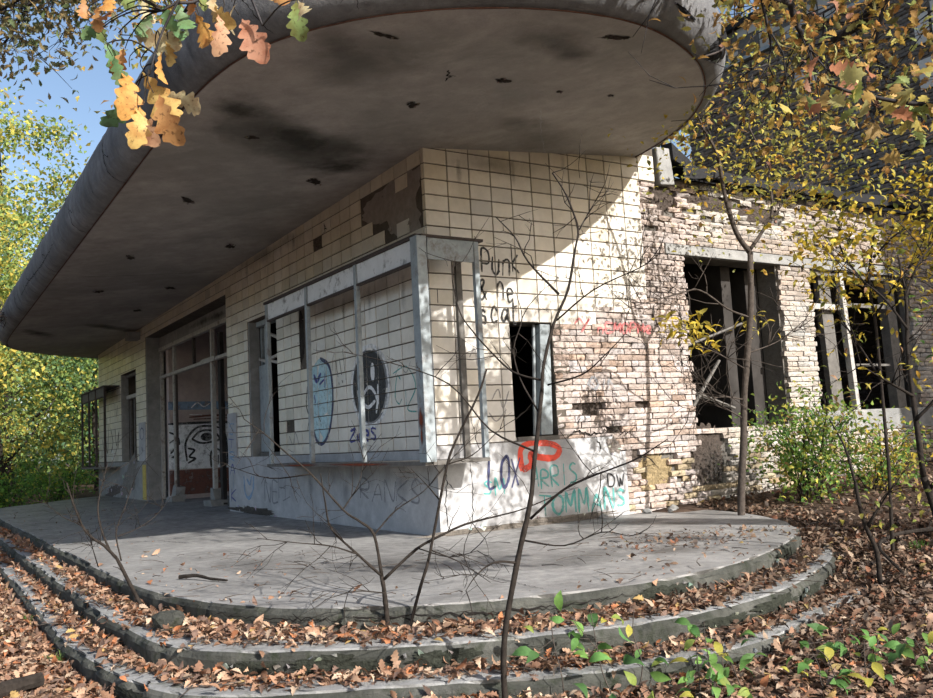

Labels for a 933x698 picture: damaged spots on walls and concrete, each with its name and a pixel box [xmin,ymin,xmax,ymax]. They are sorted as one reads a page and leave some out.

peeling [362,166,421,236]
spalling [572,397,603,422]
spalling [594,426,672,490]